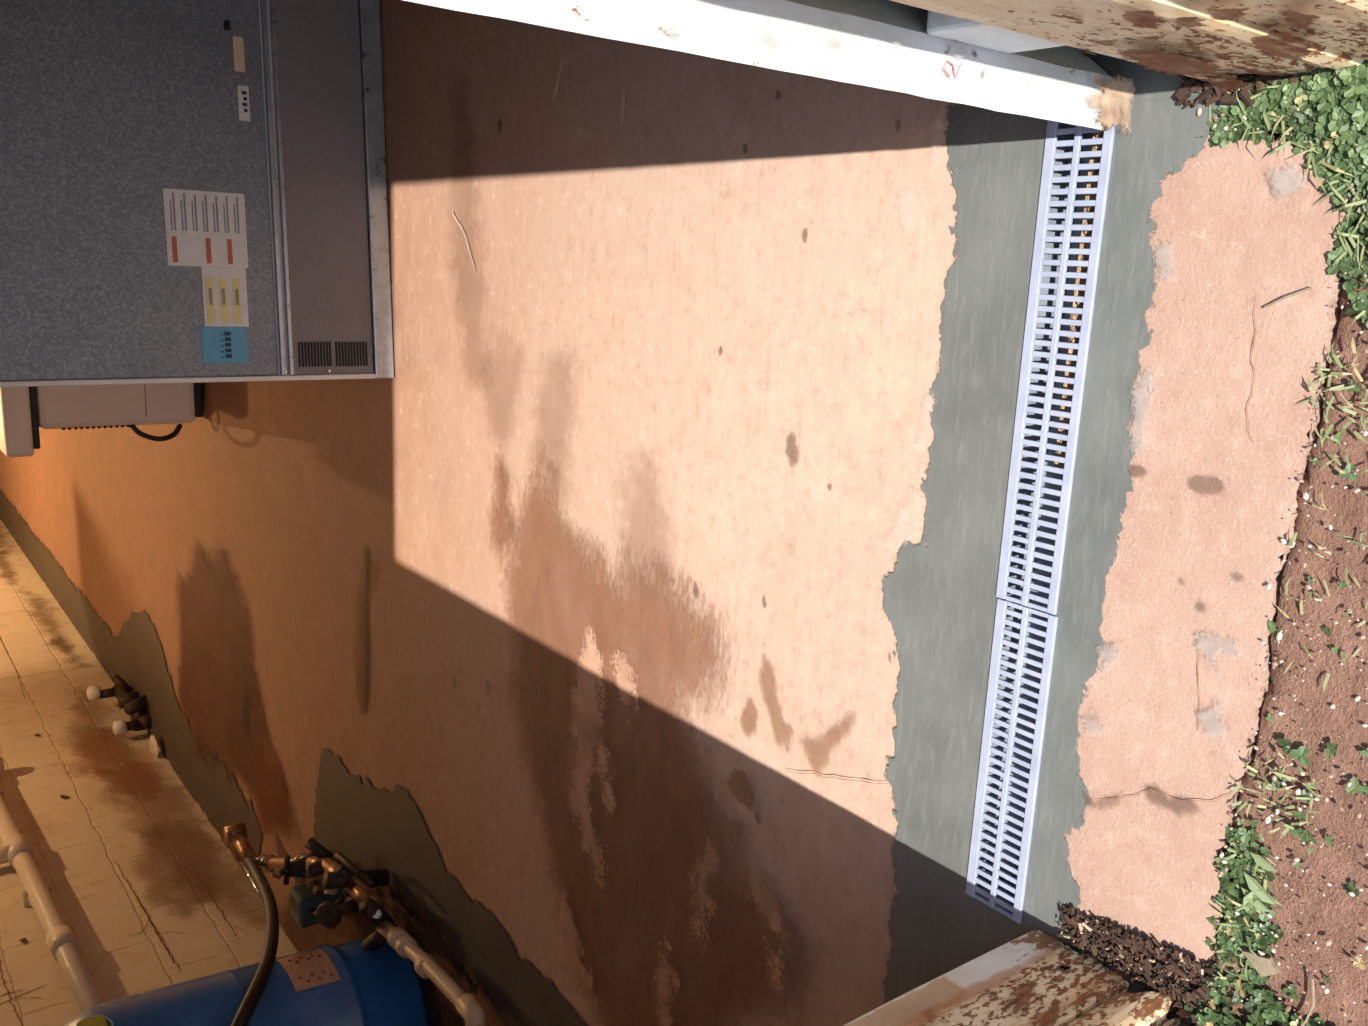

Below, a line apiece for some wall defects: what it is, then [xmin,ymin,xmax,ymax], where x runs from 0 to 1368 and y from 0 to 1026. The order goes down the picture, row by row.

leakage [177,549,288,829]
leakage [490,459,803,1026]
leakage [806,720,852,774]